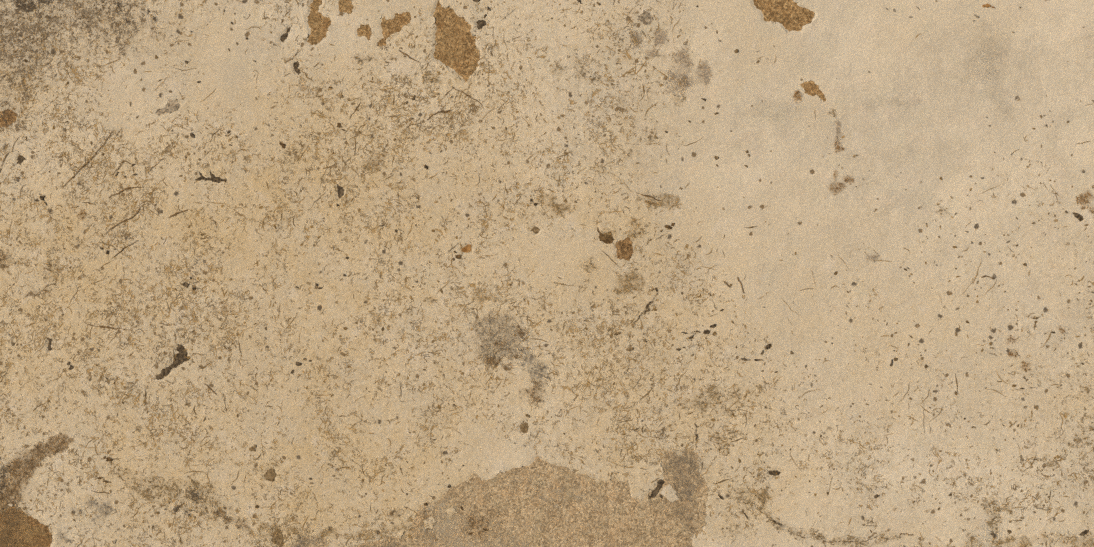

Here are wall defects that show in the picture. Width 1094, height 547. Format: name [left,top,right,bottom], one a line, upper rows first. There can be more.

peeling [304,0,353,45]
peeling [357,12,411,46]
spalling [431,0,490,85]
spalling [753,0,817,34]
spalling [800,78,826,102]
spalling [0,109,20,127]
spalling [264,467,276,482]
spalling [357,448,723,547]
spalling [0,504,55,547]
spalling [272,529,331,547]